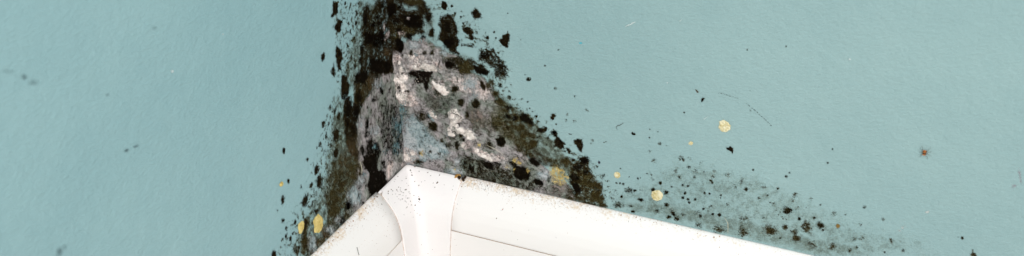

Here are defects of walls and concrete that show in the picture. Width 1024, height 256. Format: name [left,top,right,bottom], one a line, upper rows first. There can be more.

mould [272,0,748,256]
mould [758,186,840,248]